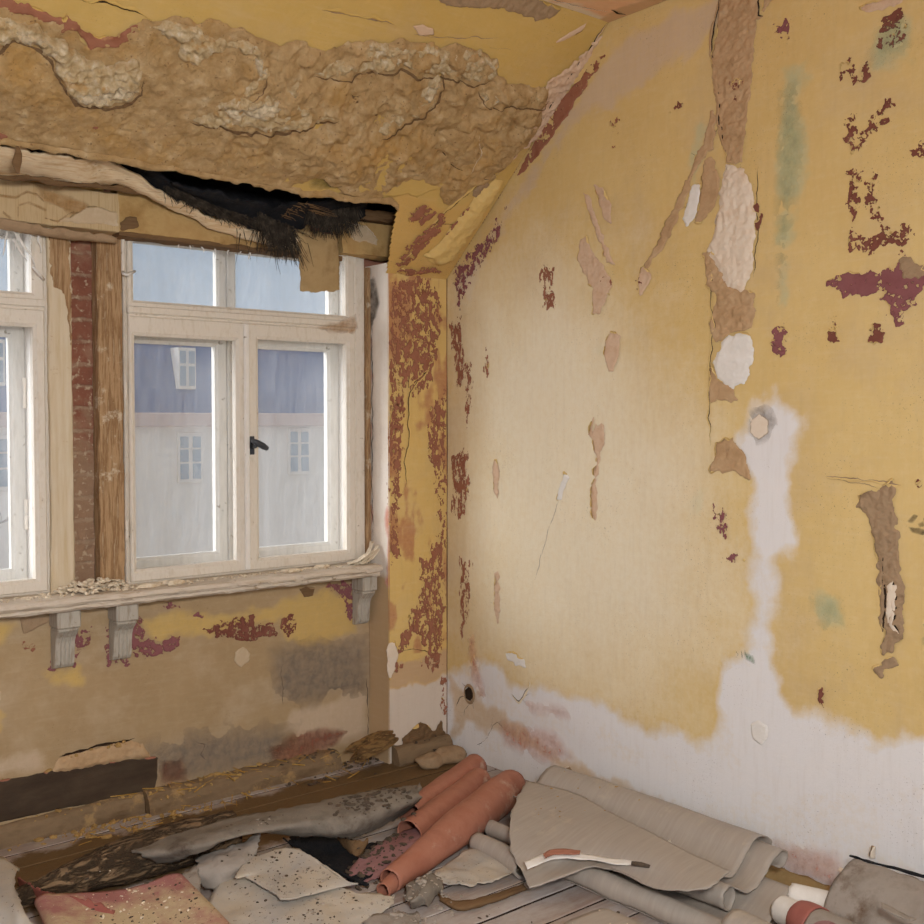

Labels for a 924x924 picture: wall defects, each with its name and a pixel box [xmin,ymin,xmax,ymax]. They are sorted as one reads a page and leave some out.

crack [82,0,152,21]
flaking render [635,0,758,296]
peeling [843,98,896,154]
flaking render [0,0,606,566]
flaking render [701,251,756,403]
peeling [826,169,924,327]
peeling [867,323,885,344]
flaking render [708,437,751,480]
peeling [193,612,297,642]
peeling [386,389,473,744]
flaking render [856,478,905,679]
flaking render [52,738,183,780]